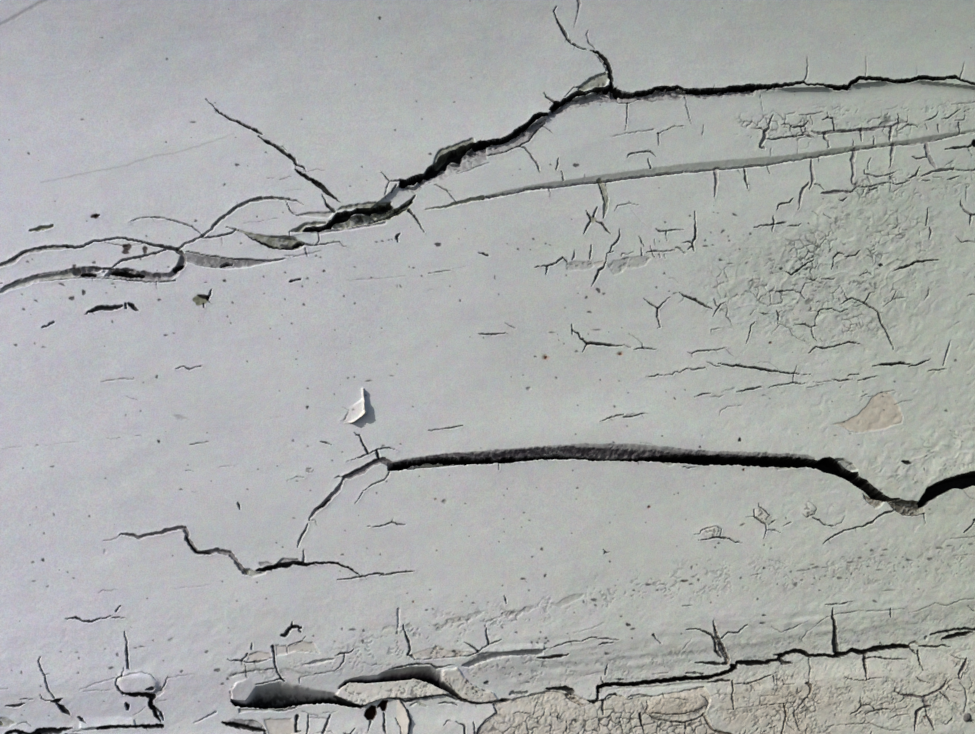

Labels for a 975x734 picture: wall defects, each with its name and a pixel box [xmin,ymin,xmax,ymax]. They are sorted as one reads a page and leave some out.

crack [0,0,975,416]
peeling [339,388,367,424]
peeling [829,389,914,434]
crack [103,412,975,581]
crack [0,654,166,734]
crack [64,604,130,671]
crack [227,634,355,684]
crack [286,710,379,734]
crack [396,607,503,661]
crack [442,719,477,734]
peeling [220,635,728,734]
crack [586,597,975,734]